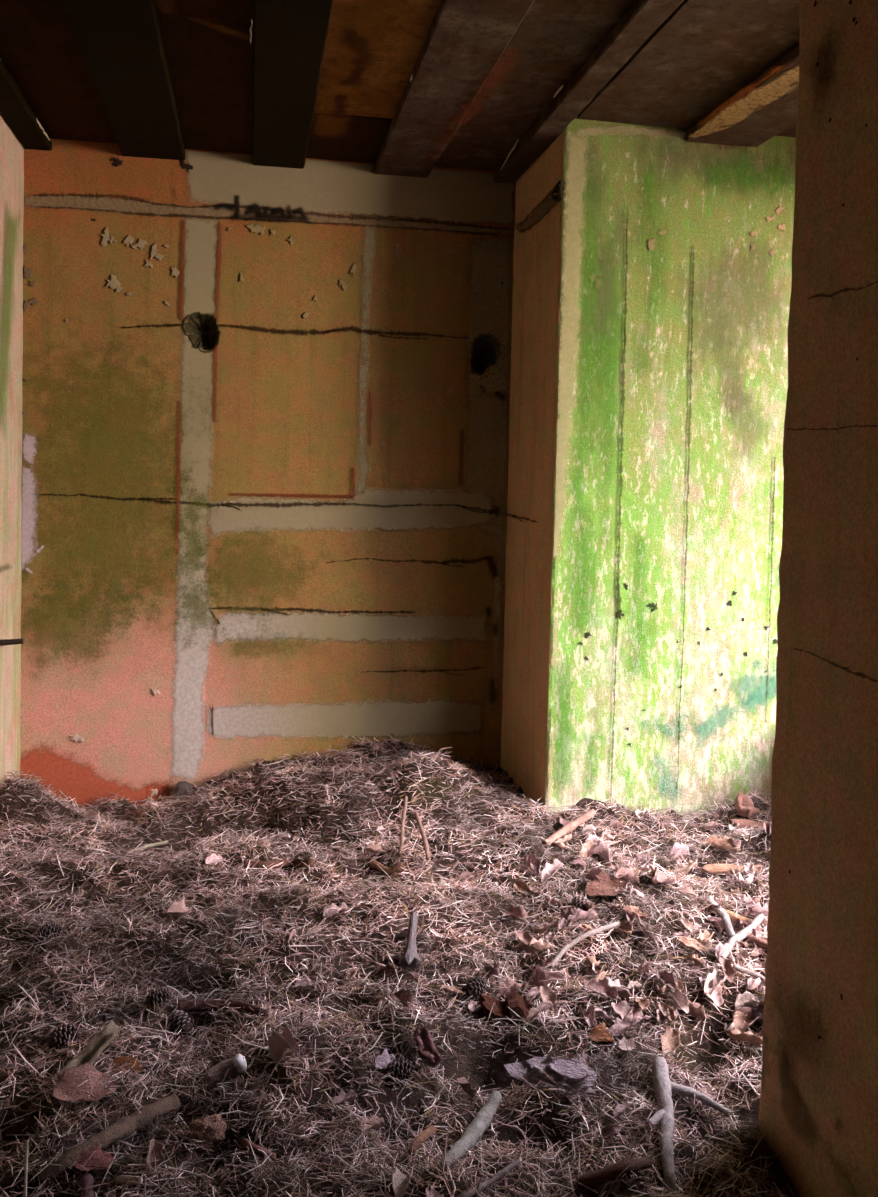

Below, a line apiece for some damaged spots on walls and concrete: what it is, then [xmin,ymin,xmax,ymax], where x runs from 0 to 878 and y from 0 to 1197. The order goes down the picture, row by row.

crack [120,322,184,330]
crack [218,324,469,339]
flaking render [93,139,519,779]
crack [35,493,538,523]
crack [326,556,489,567]
crack [209,607,416,625]